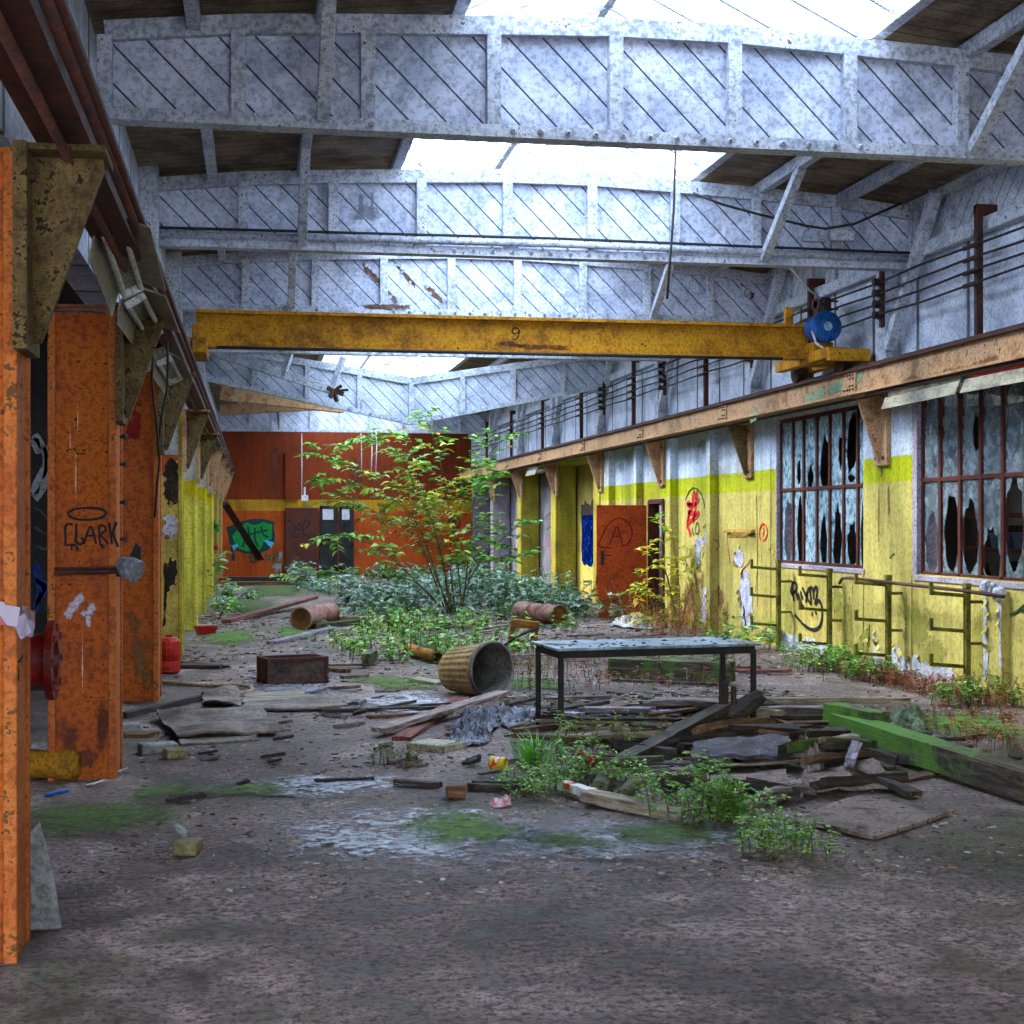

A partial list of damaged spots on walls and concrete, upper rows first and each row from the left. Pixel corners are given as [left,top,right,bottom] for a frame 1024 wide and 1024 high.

rust [500,341,567,350]
peeling [162,458,183,540]
peeling [733,545,826,657]
peeling [978,596,1002,681]
rust [63,704,108,767]